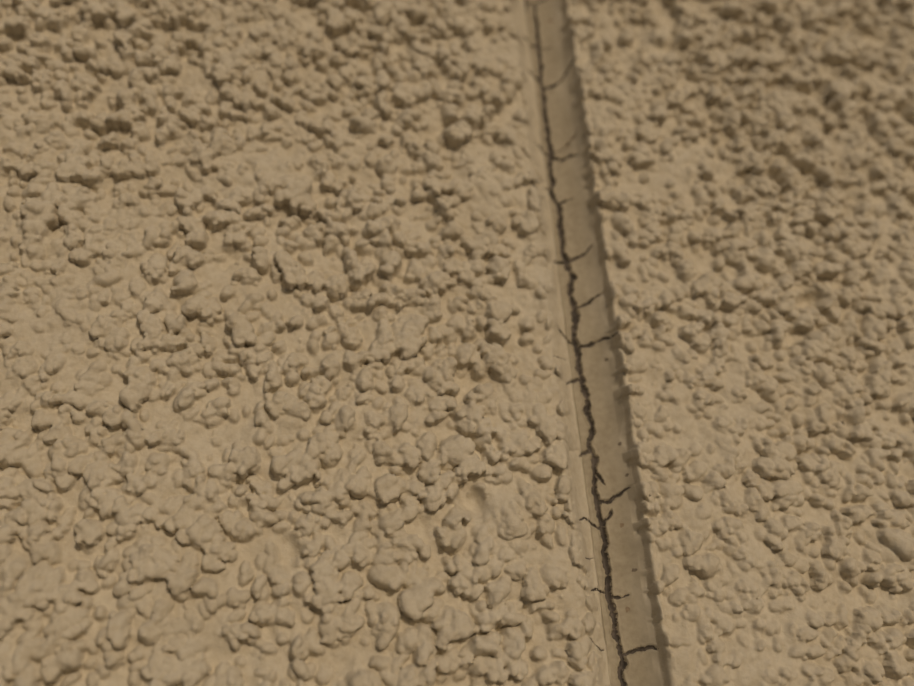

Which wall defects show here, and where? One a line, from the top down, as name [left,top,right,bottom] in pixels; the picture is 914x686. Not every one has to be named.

crack [523,0,657,686]